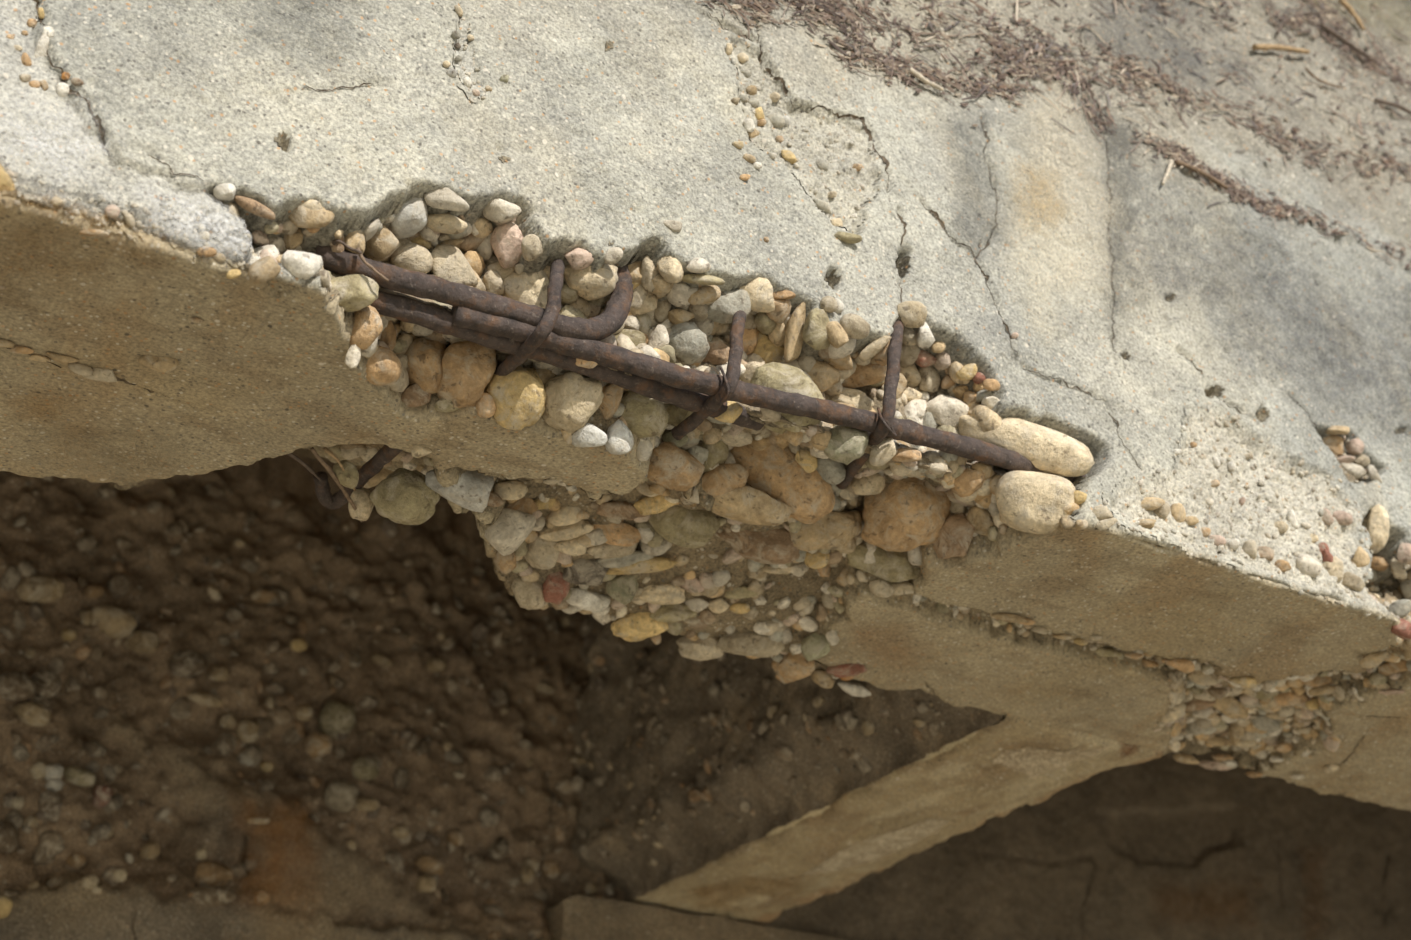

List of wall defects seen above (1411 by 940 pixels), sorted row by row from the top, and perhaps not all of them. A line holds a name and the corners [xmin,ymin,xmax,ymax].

crack [6,0,110,157]
crack [149,155,204,181]
spalling [226,269,242,279]
spalling [274,131,290,152]
spalling [443,17,509,104]
spalling [726,39,882,244]
spalling [825,269,842,289]
spalling [895,254,911,277]
crack [708,1,1142,470]
spalling [1092,385,1411,647]
spalling [0,510,523,919]
spalling [381,716,617,940]